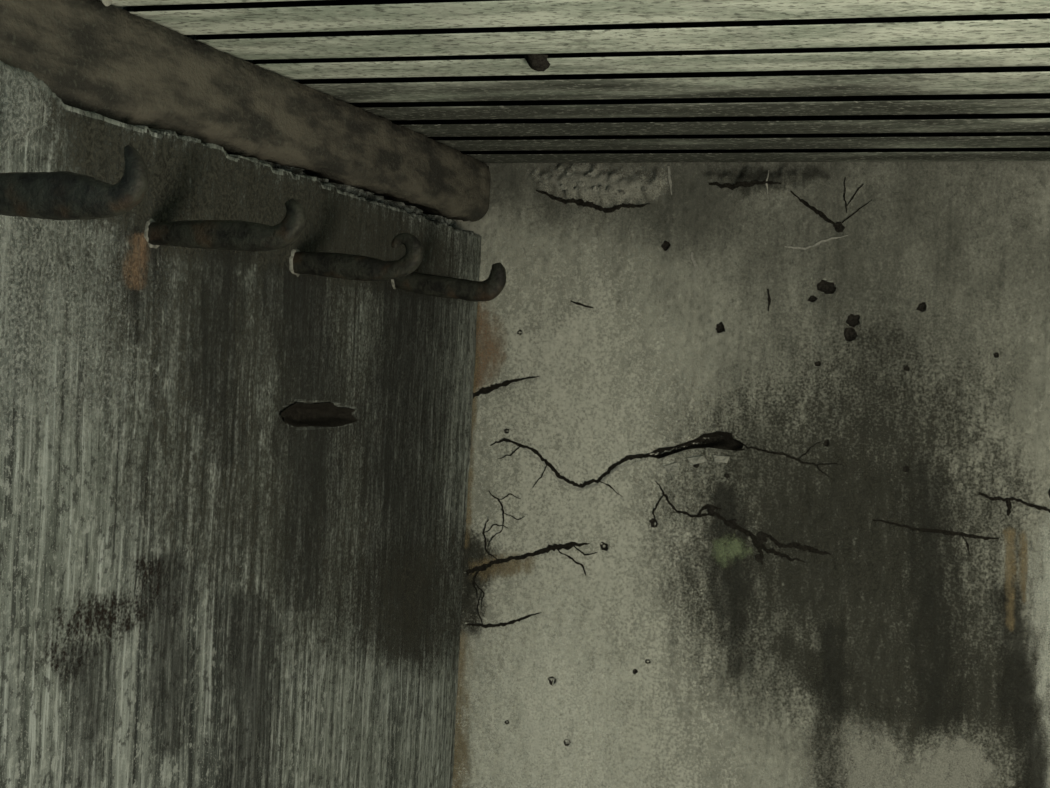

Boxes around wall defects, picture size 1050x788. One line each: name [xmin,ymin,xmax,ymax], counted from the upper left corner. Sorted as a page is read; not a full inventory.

crack [473,376,540,398]
crack [466,438,842,628]
crack [873,492,1050,555]